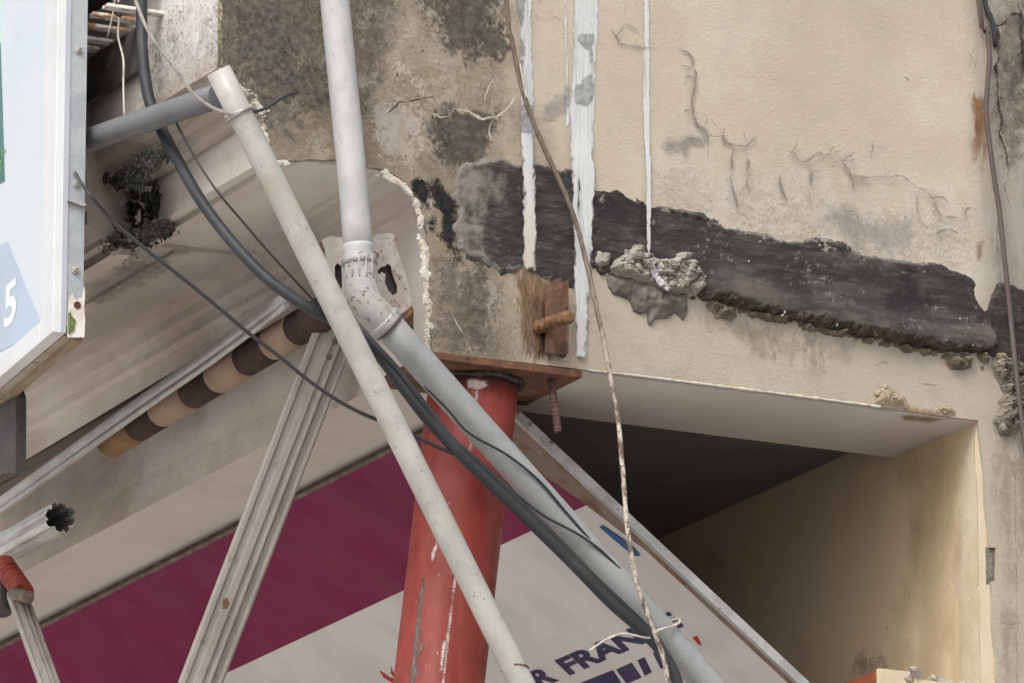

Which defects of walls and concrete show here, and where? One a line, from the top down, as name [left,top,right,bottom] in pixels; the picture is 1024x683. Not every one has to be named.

crack [371,96,451,140]
leakage [409,0,599,357]
peeling [451,158,1024,437]
crack [612,5,1024,268]
corrosion [973,95,987,159]